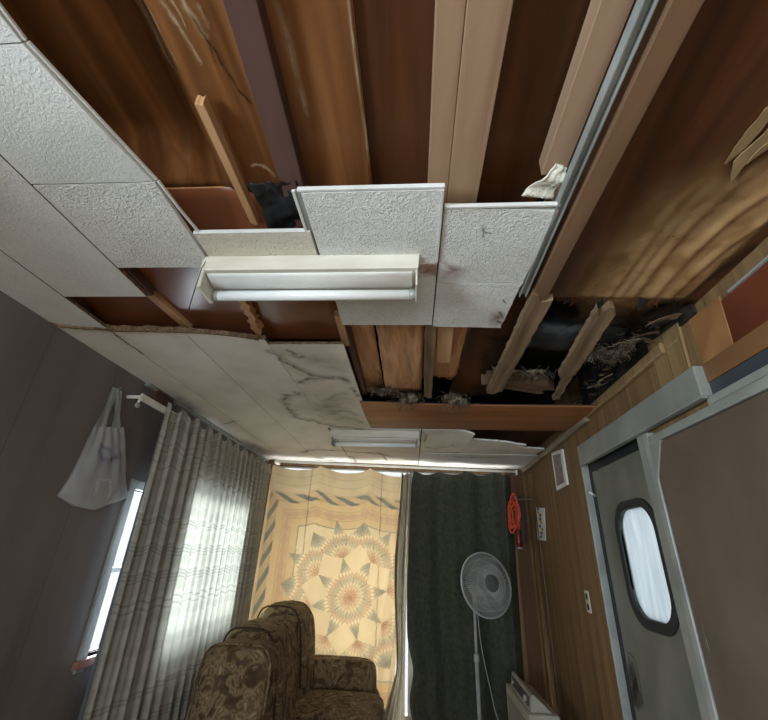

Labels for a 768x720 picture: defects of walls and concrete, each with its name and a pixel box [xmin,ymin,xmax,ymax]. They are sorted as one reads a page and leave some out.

crack [199,30,250,103]